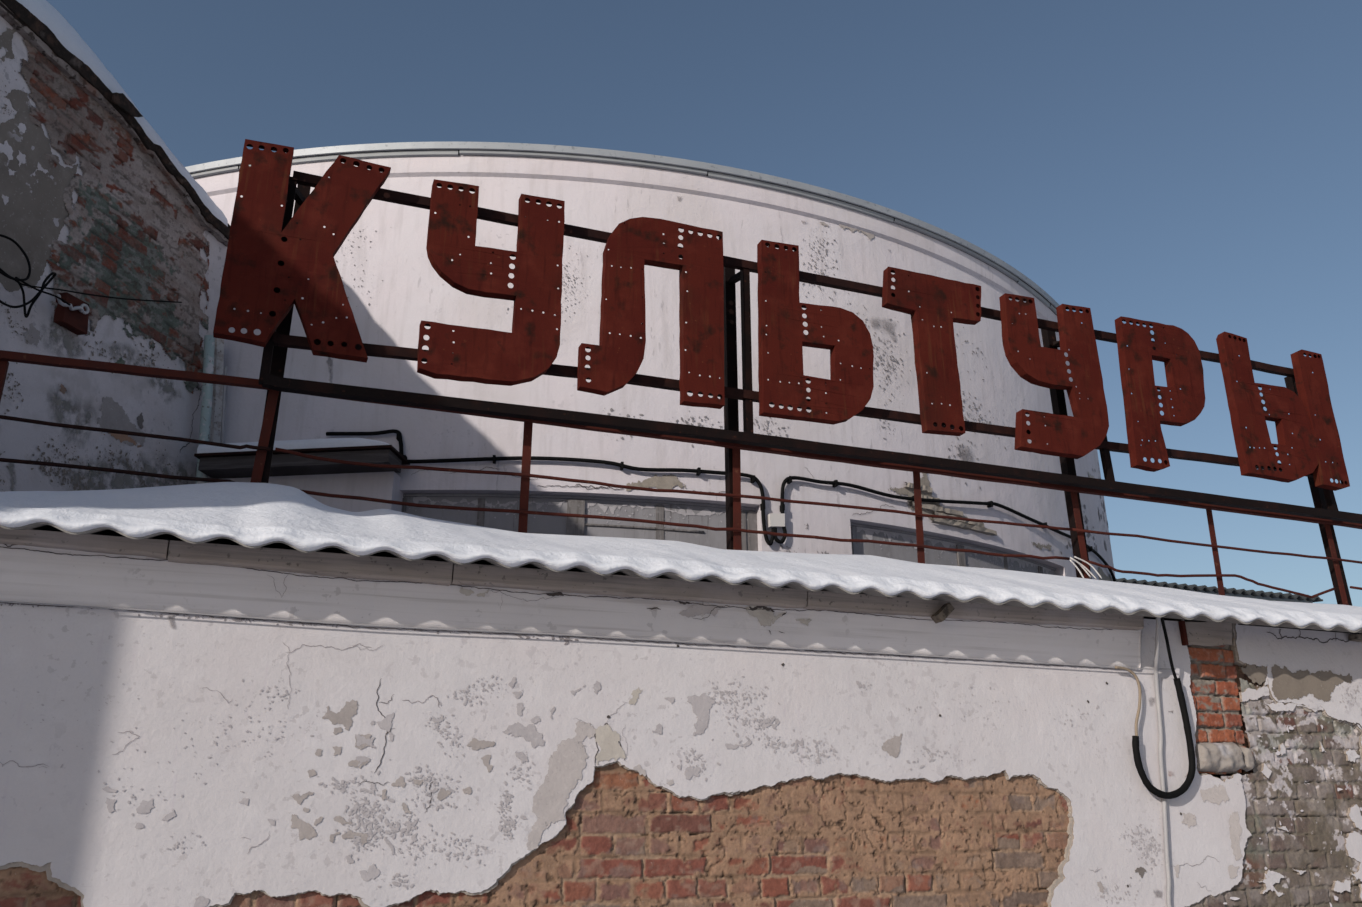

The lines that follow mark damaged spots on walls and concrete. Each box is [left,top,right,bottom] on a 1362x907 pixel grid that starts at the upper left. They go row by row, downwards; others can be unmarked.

spalling [0,27,210,394]
spalling [853,473,1052,574]
crack [0,544,1120,785]
spalling [0,866,81,907]
spalling [97,675,1069,907]
peeling [1097,823,1180,907]
spalling [1190,664,1362,907]